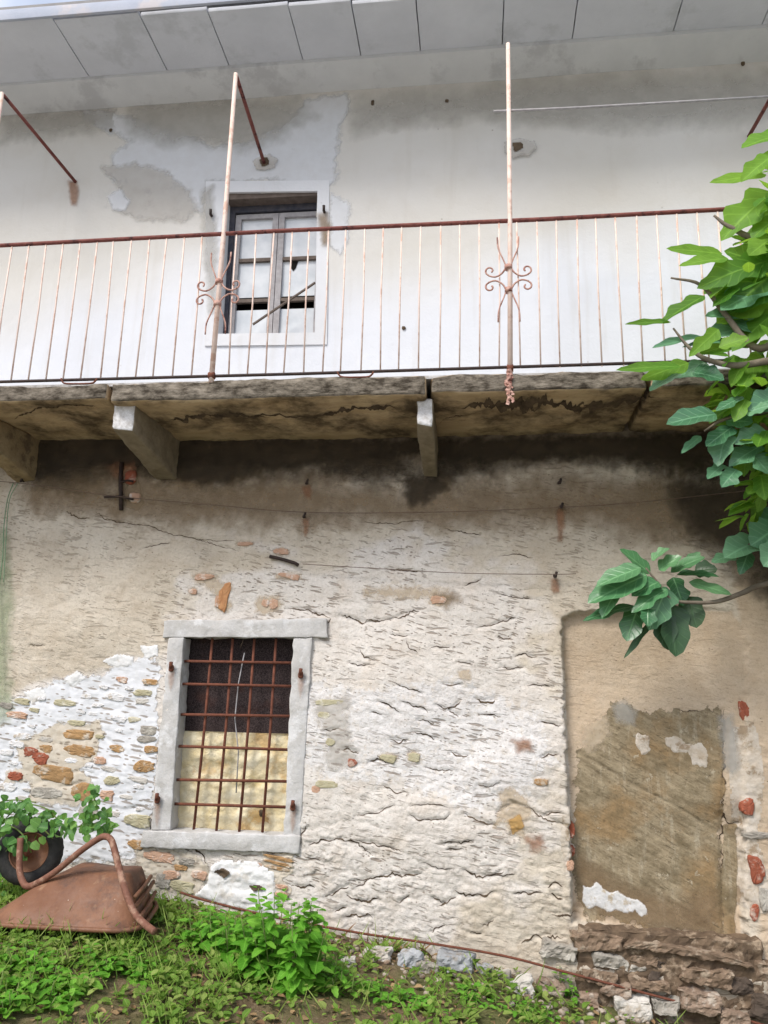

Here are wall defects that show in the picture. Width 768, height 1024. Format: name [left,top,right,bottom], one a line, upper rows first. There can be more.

spalling [505,138,537,158]
corrosion [70,182,78,204]
peeling [83,94,350,254]
crack [254,405,397,419]
damp [30,432,768,548]
crack [67,511,233,549]
damp [732,551,768,595]
peeling [0,645,209,902]
spalling [560,698,768,934]